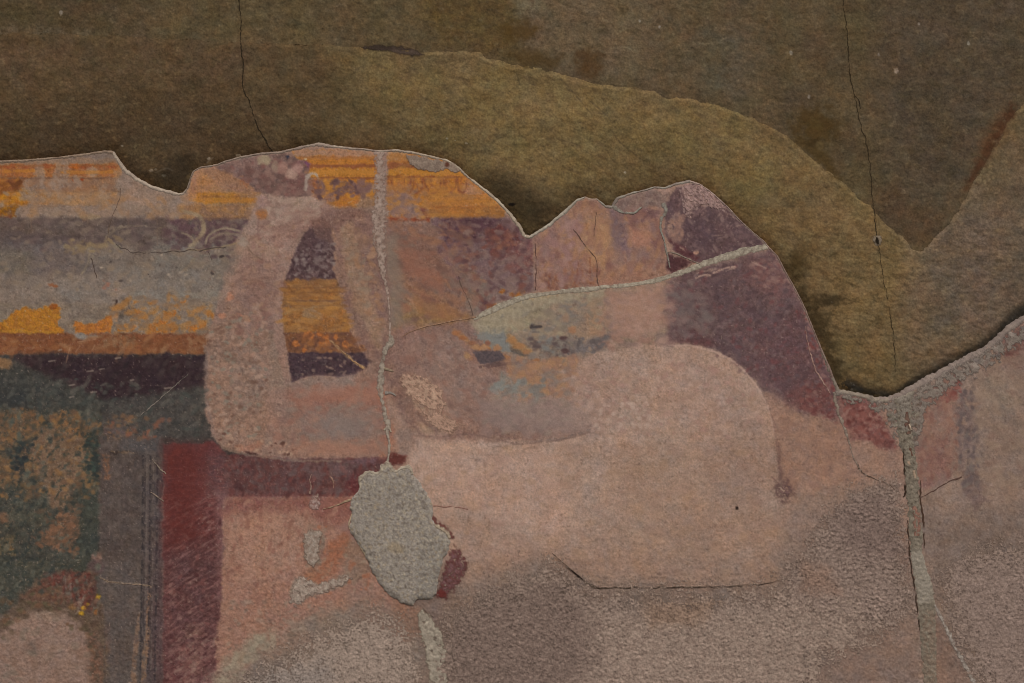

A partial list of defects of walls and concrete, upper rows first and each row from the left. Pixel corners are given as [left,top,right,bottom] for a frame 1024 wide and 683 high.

crack [238,0,273,152]
spalling [363,45,422,56]
spalling [406,154,460,173]
spalling [683,184,725,218]
crack [843,0,896,372]
crack [372,149,396,464]
crack [921,476,962,498]
spalling [289,529,352,607]
peeling [432,516,467,599]
crack [552,553,773,589]